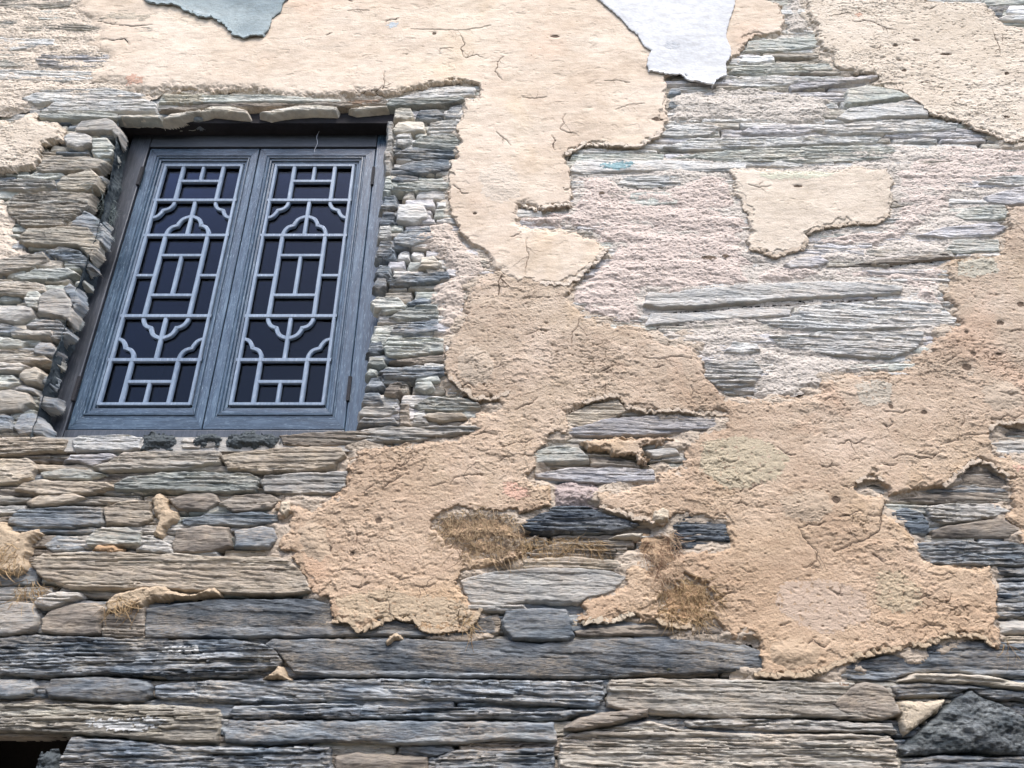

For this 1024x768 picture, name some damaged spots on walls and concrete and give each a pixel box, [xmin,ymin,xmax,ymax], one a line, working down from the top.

spalling [0,0,266,117]
spalling [0,200,29,261]
crack [497,233,541,299]
spalling [303,0,1024,683]
spalling [263,494,343,569]